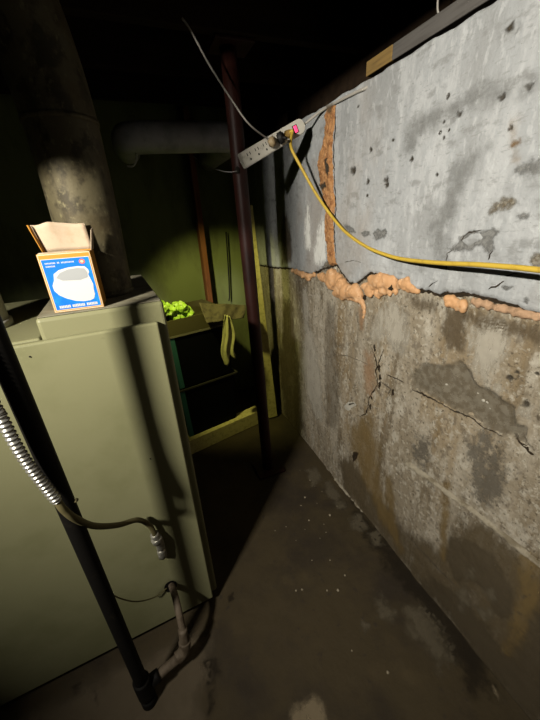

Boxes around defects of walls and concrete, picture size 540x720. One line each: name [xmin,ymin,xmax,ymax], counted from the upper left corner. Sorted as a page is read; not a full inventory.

crack [260,104,540,326]
peeling [450,229,498,260]
crack [342,344,404,417]
spalling [413,363,534,455]
leakage [412,437,430,471]
leakage [467,432,506,506]
leakage [307,460,540,720]